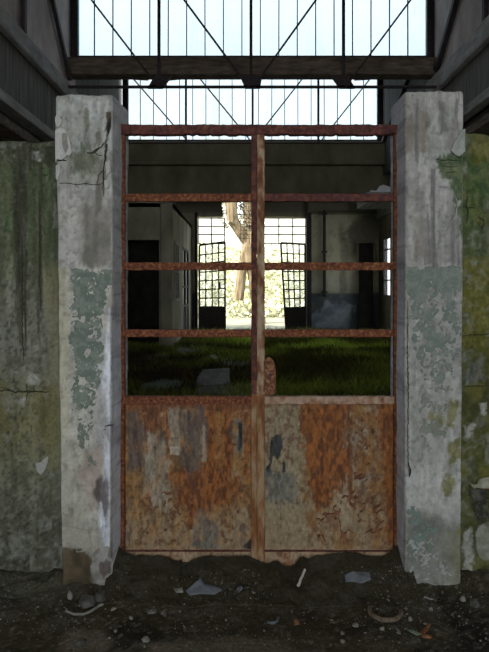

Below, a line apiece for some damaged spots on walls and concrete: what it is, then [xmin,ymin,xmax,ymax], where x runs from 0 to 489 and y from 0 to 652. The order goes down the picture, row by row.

flaking render [55,114,72,180]
crack [57,139,108,197]
leakage [0,146,57,354]
crack [0,384,50,399]
leakage [25,369,42,387]
peeling [66,251,113,467]
peeling [404,265,463,438]
leakage [461,401,489,444]
leakage [462,352,489,388]
corrosion [158,410,252,532]
corrosion [296,404,393,549]
flaking render [460,477,489,571]